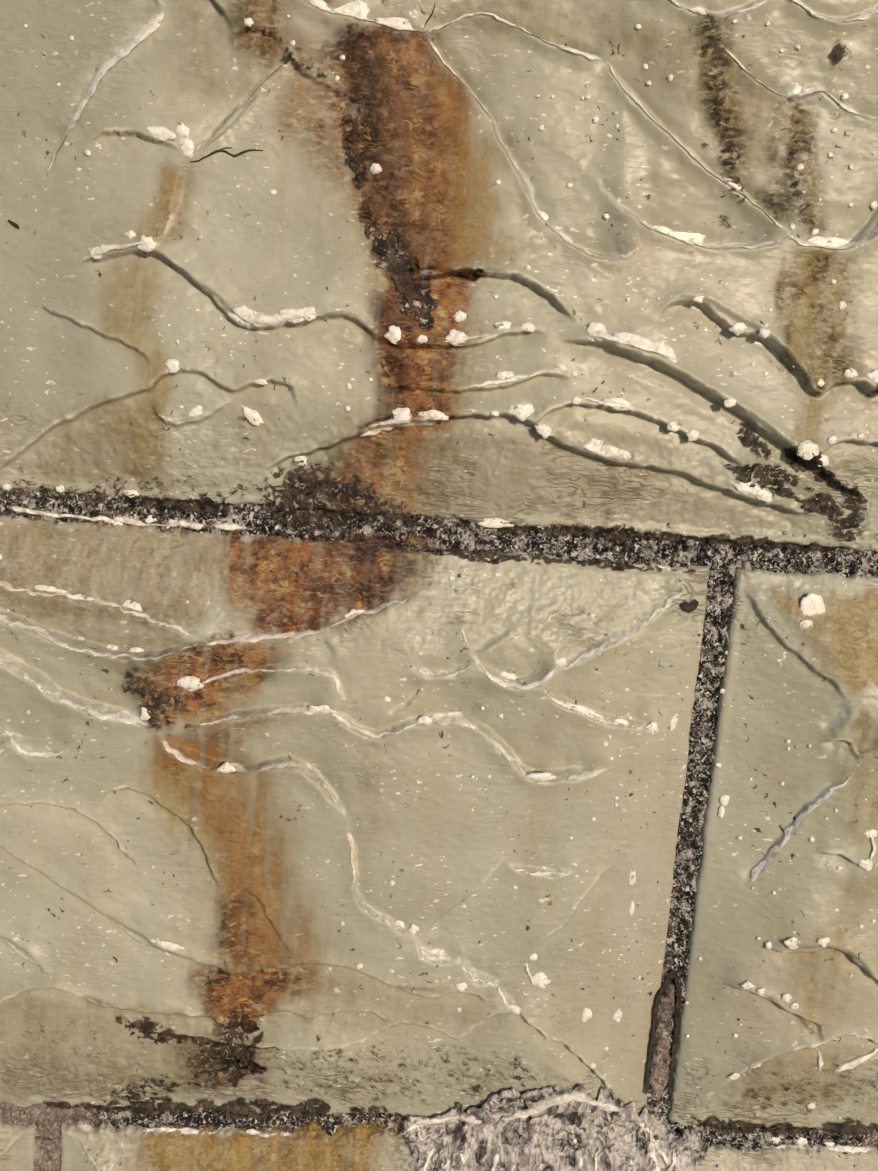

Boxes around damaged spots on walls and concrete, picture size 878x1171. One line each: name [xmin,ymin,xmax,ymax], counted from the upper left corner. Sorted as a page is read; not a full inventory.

rust [239,0,278,58]
crack [190,147,264,163]
rust [310,25,487,513]
water stain [0,420,878,729]
water stain [267,705,478,738]
water stain [551,698,658,735]
water stain [163,741,203,766]
rust [130,532,414,1027]
water stain [217,761,343,811]
water stain [489,739,605,784]
crack [645,969,682,1094]
rust [144,1123,375,1171]